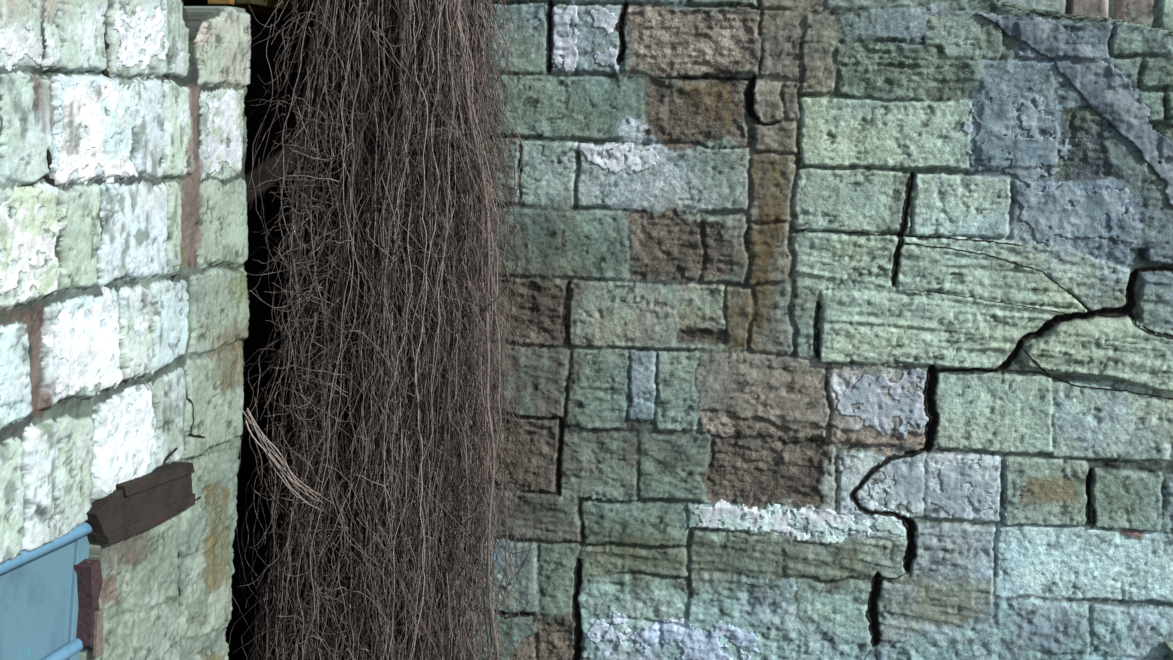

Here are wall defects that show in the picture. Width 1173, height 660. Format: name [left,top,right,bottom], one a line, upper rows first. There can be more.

crack [545,0,553,72]
crack [616,2,627,65]
crack [659,76,782,126]
crack [813,302,821,360]
crack [831,172,1173,660]
crack [572,559,582,660]